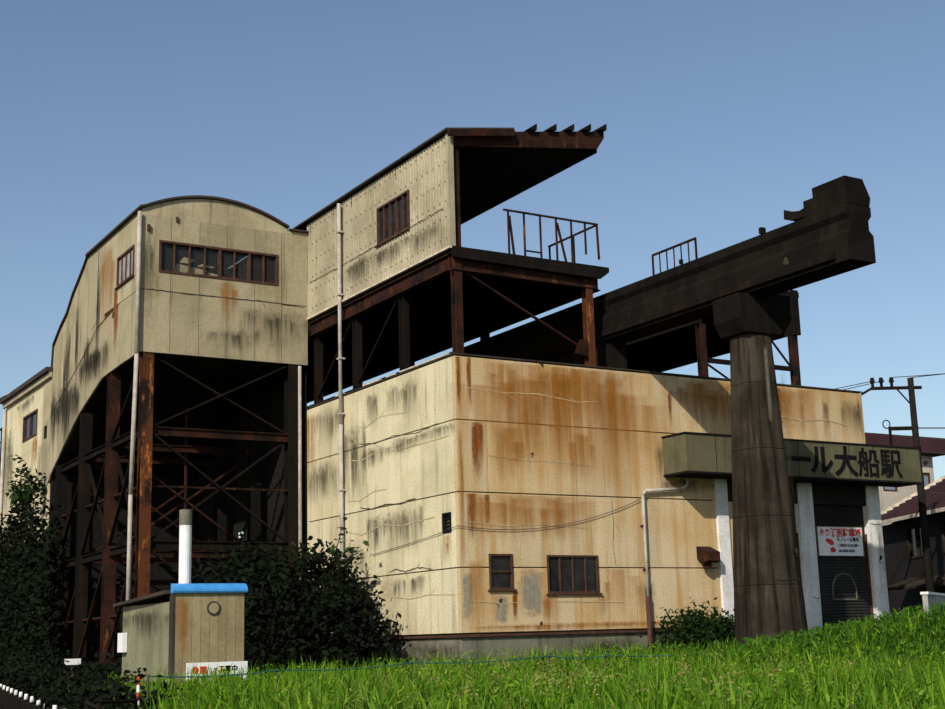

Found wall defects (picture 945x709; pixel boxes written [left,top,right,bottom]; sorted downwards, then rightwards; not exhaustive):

water stain [52,322,106,432]
rust [456,356,471,395]
crack [347,409,449,461]
rust [472,423,483,460]
crack [348,487,433,535]
rust [468,494,489,530]